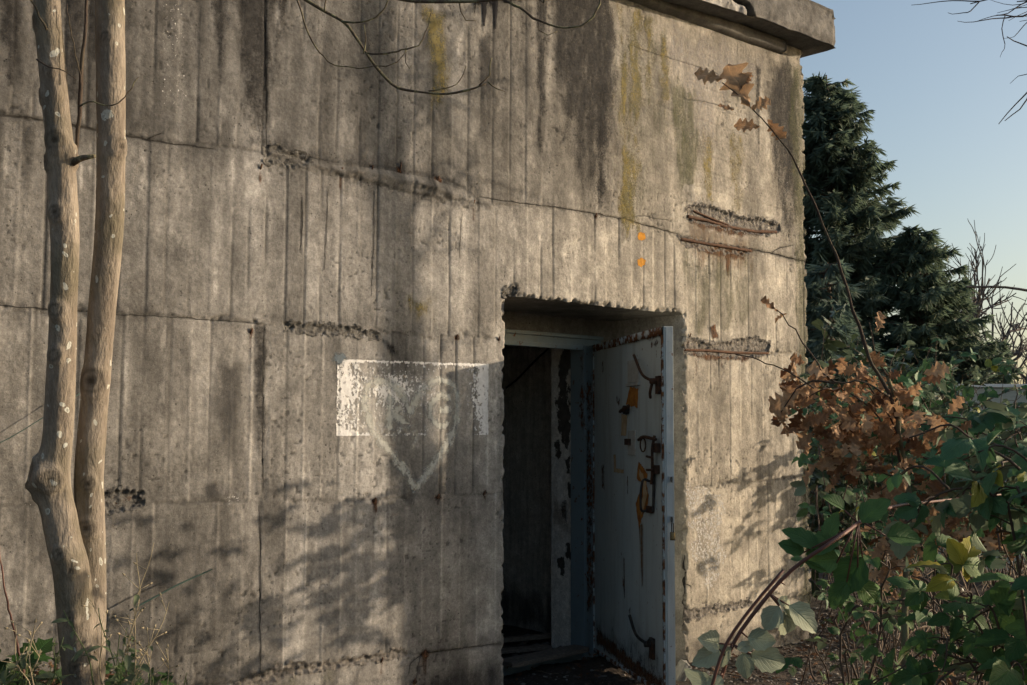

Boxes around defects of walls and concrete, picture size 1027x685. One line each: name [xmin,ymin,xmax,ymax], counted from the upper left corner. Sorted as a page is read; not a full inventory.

leakage [3,0,34,83]
leakage [211,0,287,143]
leakage [474,1,498,116]
crack [0,113,43,121]
crack [126,133,213,149]
leakage [525,0,641,234]
spalling [678,175,787,257]
rust [703,246,753,275]
spalling [681,335,771,360]
peeling [554,349,571,519]
rust [579,383,604,611]
rust [596,629,663,685]